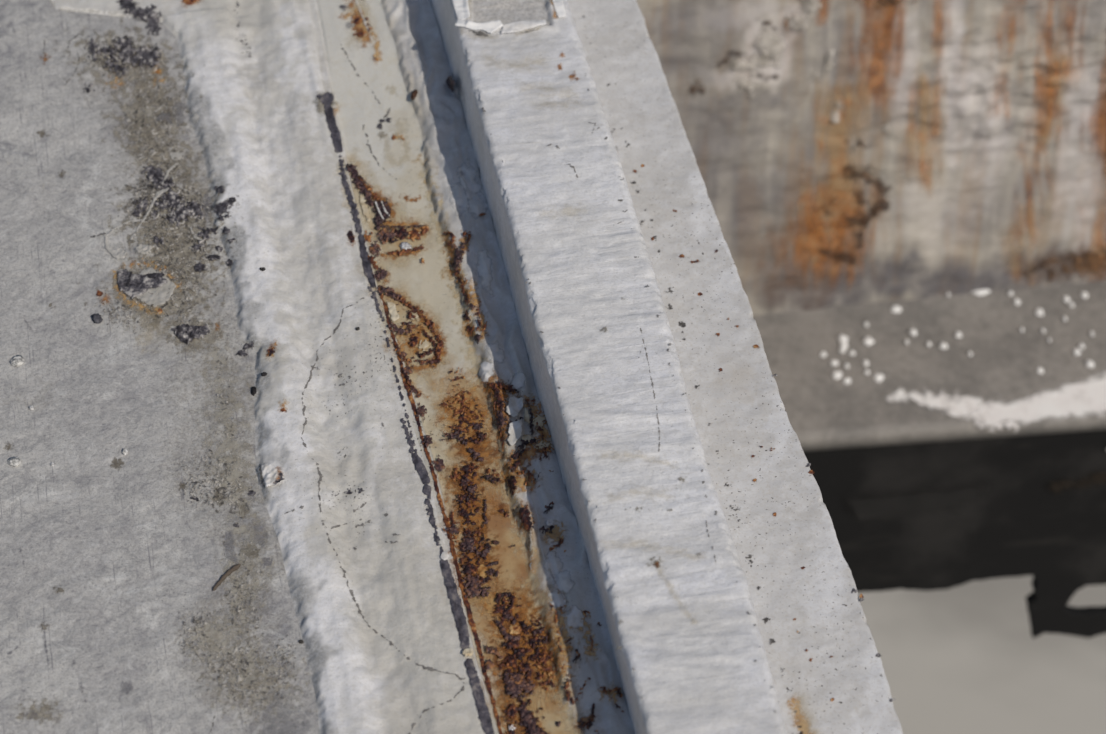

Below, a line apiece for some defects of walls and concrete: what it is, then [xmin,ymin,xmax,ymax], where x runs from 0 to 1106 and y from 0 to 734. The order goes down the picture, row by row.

corrosion [340,0,382,61]
damp [17,699,60,722]
damp [173,332,307,720]
crack [285,298,465,734]
corrosion [346,159,580,734]
damp [886,372,1106,432]